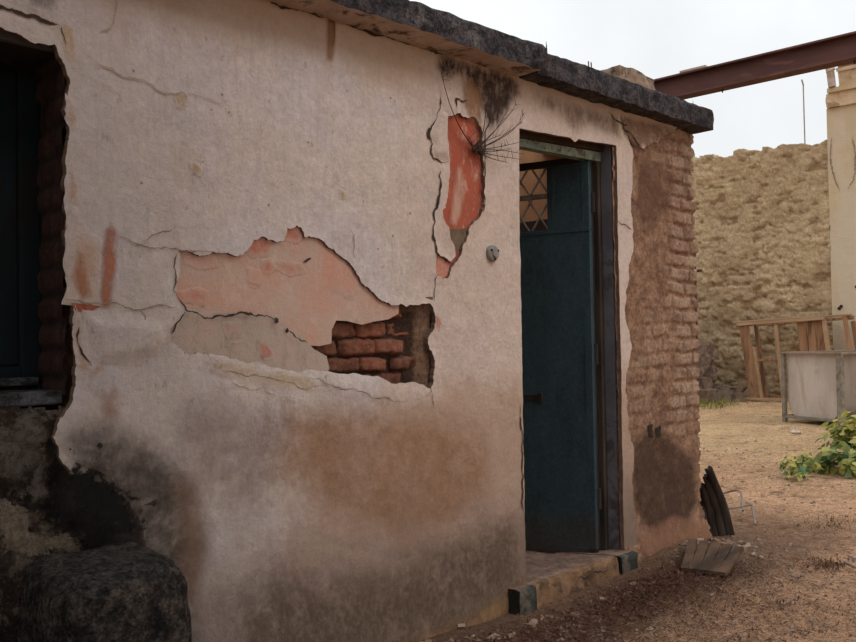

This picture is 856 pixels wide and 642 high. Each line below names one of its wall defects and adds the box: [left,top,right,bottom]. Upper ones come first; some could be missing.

crack [0,5,66,43]
damp [16,0,69,30]
crack [90,56,225,104]
damp [80,0,518,125]
damp [528,85,671,146]
peeling [436,114,483,278]
peeling [170,227,443,399]
flaking render [0,405,93,642]
damp [42,435,192,573]
damp [246,369,503,561]
damp [634,437,710,557]
damp [252,541,509,642]